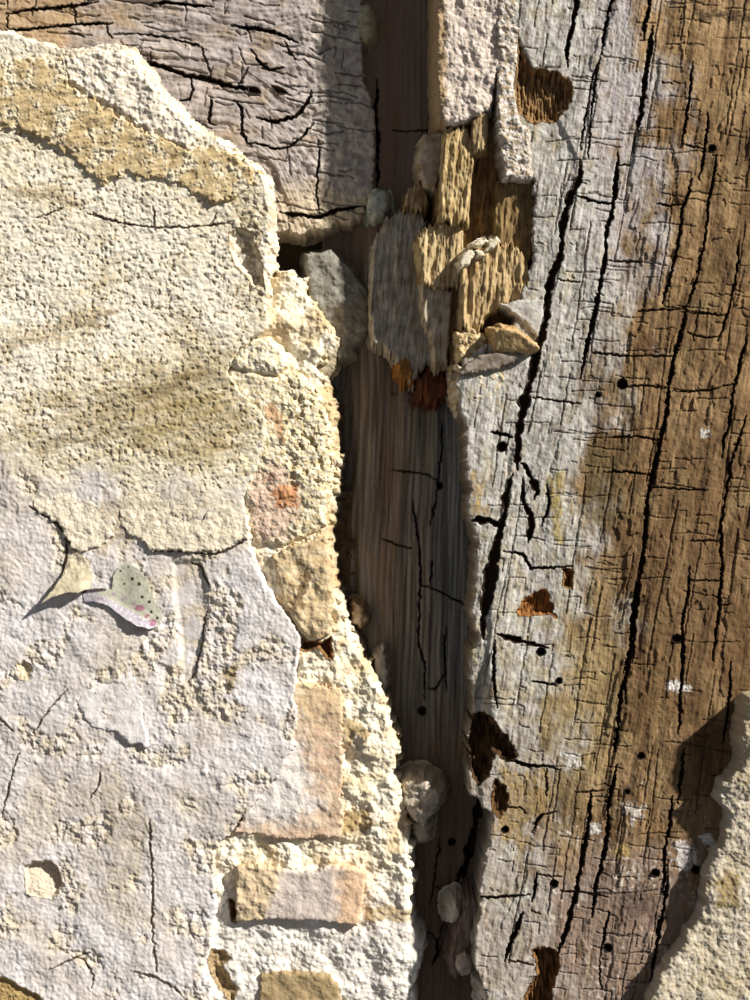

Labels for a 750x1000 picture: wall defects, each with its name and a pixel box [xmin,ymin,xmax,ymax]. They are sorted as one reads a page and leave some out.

crack [5,0,362,219]
crack [87,210,233,228]
spalling [271,485,300,509]
crack [383,0,748,987]
crack [29,506,77,572]
crack [154,540,245,588]
spalling [300,637,334,661]
crack [0,689,68,818]
crack [48,952,94,988]